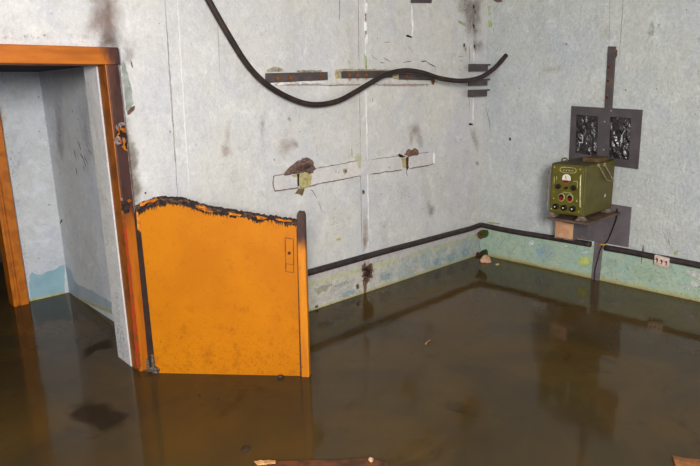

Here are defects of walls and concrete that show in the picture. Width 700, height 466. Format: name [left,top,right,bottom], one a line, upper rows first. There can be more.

water stain [459,1,479,25]
corrosion [270,61,369,86]
peeling [113,60,135,151]
spalling [398,148,419,174]
spalling [284,157,316,196]